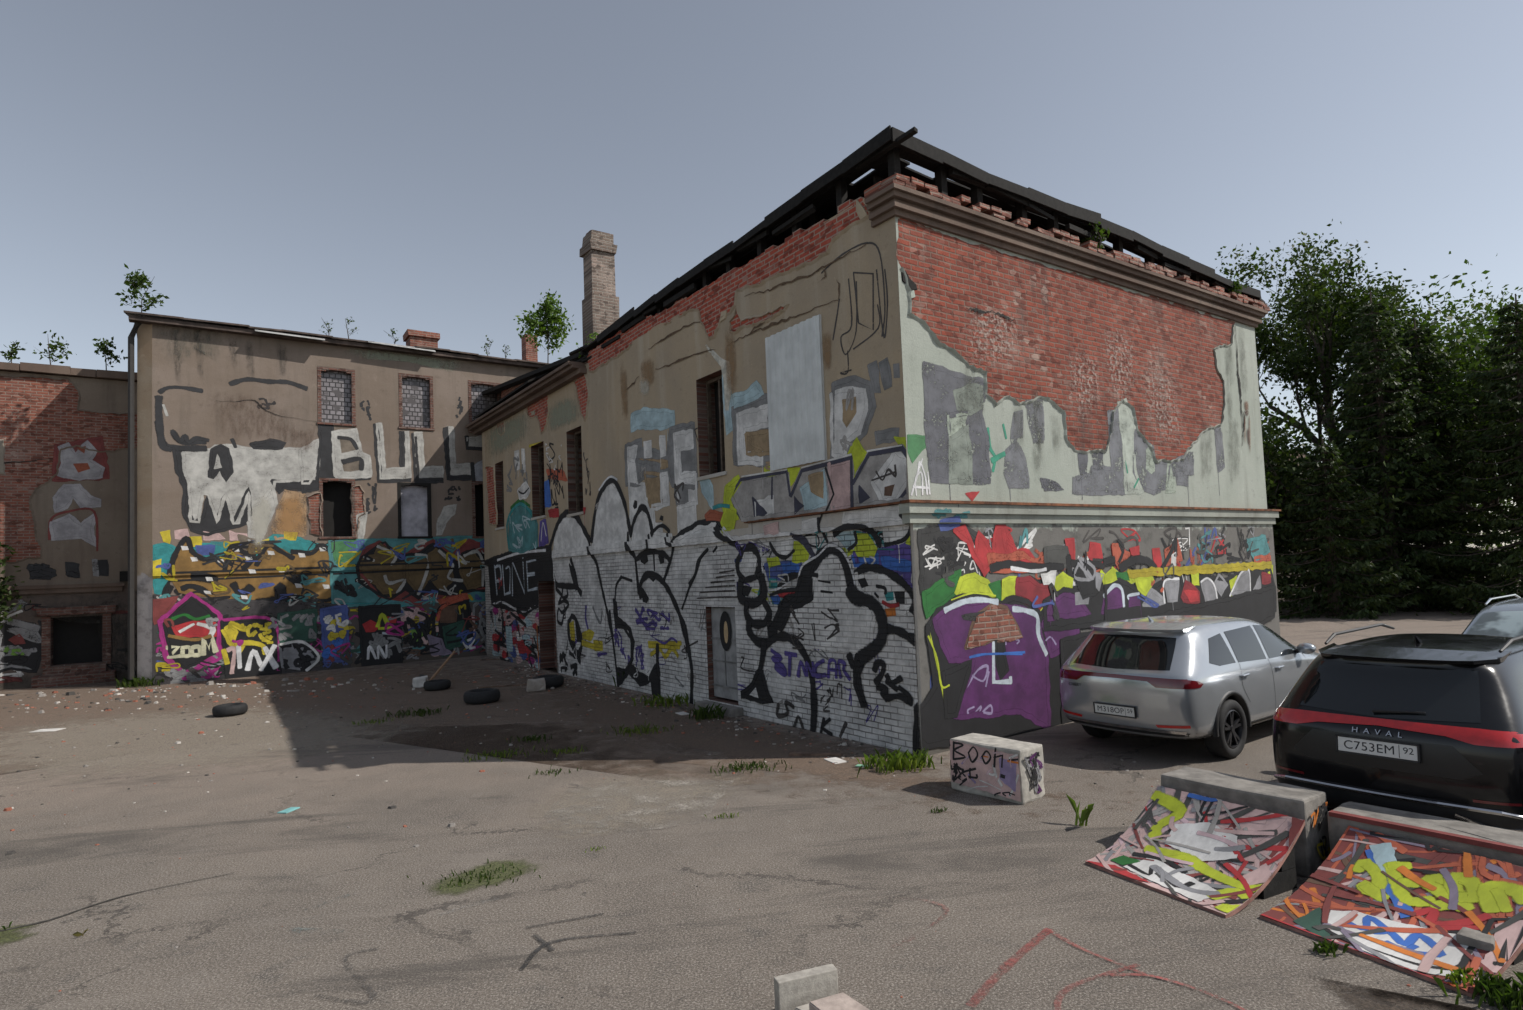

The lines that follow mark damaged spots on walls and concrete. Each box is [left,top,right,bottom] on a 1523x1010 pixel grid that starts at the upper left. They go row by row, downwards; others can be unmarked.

peeling [573,199,871,422]
peeling [896,218,1235,464]
peeling [0,375,137,564]